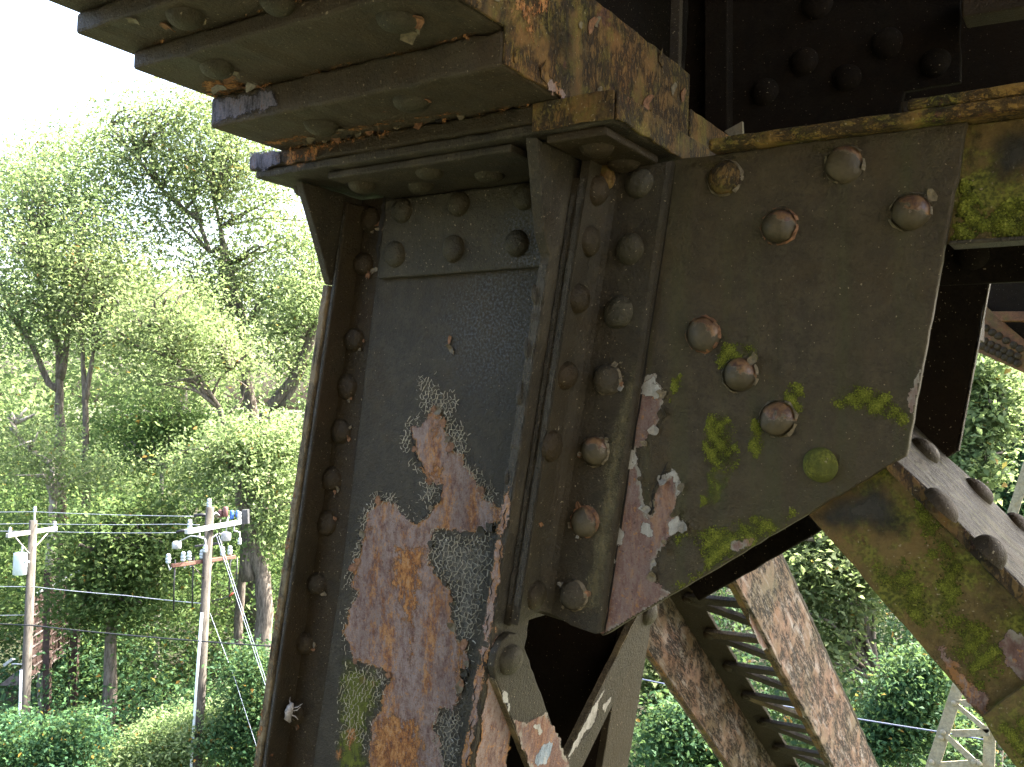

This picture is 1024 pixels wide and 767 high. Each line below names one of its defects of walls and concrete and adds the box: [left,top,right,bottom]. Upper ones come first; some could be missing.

rust [511,0,548,42]
rust [199,71,272,98]
rust [540,60,566,98]
rust [261,111,480,167]
peeling [601,373,687,634]
water stain [819,486,899,531]
rust [342,405,511,767]
rust [749,614,768,650]
peeling [502,689,611,767]